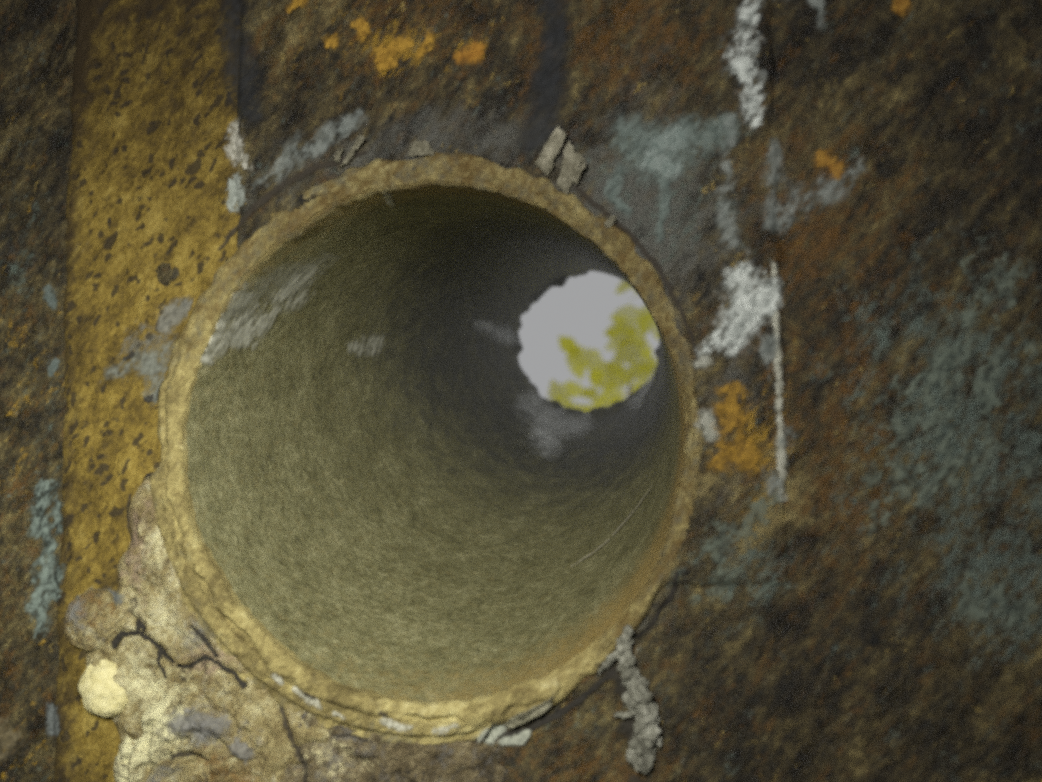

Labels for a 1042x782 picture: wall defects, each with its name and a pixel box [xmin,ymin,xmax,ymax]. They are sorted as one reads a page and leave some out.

rust [325,35,338,48]
rust [351,18,369,41]
rust [374,32,433,71]
rust [454,43,485,63]
water stain [275,111,360,173]
water stain [605,0,763,239]
water stain [767,141,854,229]
rust [815,149,844,179]
water stain [694,262,787,501]
rust [709,382,764,473]
water stain [25,479,64,637]
crack [111,619,247,689]